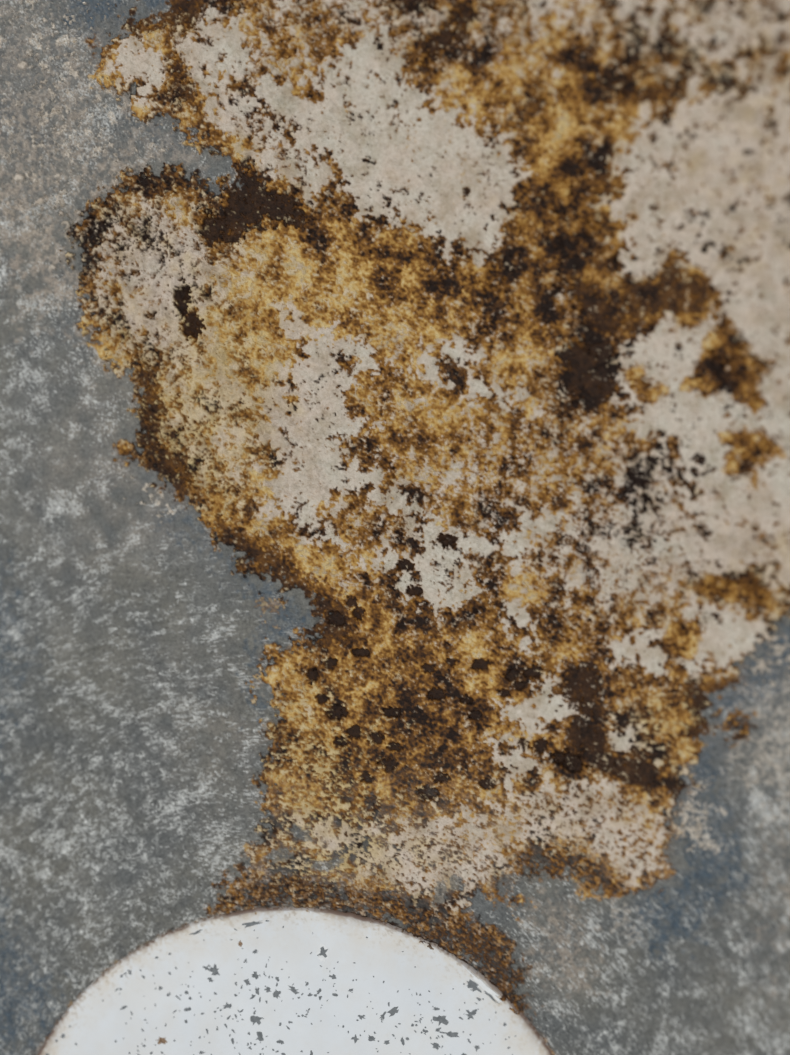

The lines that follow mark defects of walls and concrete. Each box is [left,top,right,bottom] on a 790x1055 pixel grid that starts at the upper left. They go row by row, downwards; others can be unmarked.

rust [173,285,192,318]
rust [624,363,671,406]
rust [679,314,769,415]
rust [667,436,684,462]
rust [717,422,789,476]
rust [751,472,760,490]
water stain [137,497,315,739]
rust [714,704,759,750]
rust [234,862,251,881]
rust [203,867,359,918]
rust [508,832,634,902]
rust [351,875,539,1018]